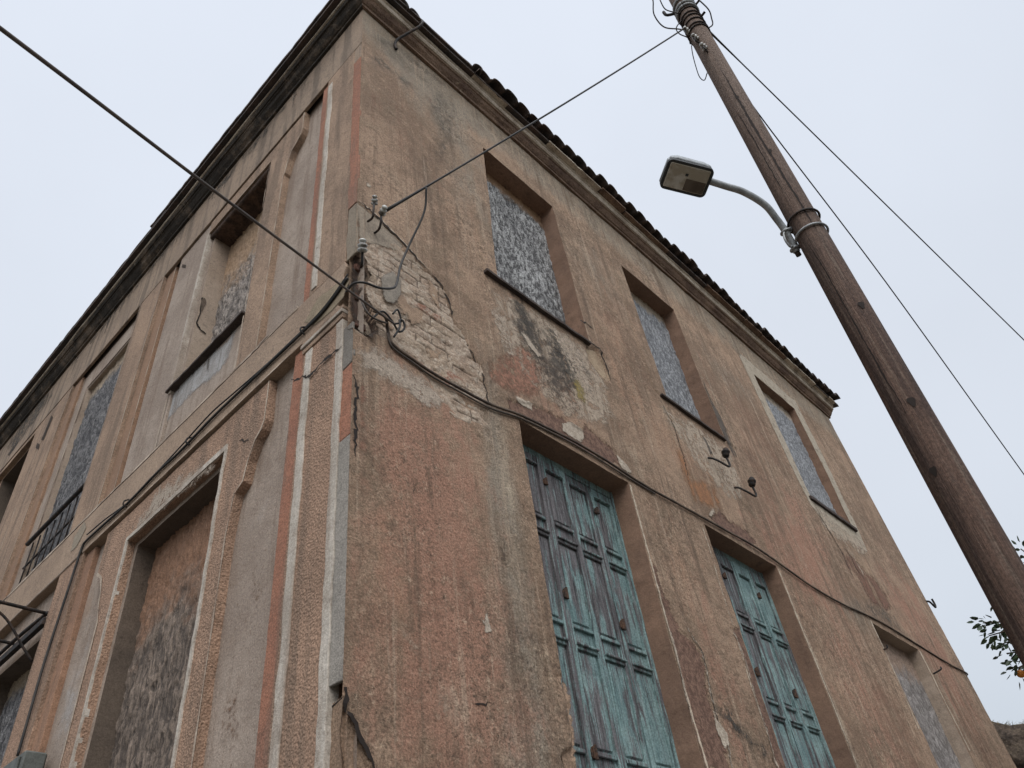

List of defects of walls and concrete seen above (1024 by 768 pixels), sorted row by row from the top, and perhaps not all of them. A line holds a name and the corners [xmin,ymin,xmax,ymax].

crack [196,297,206,334]
crack [353,375,366,457]
flaking render [347,204,631,473]
leakage [494,294,613,423]